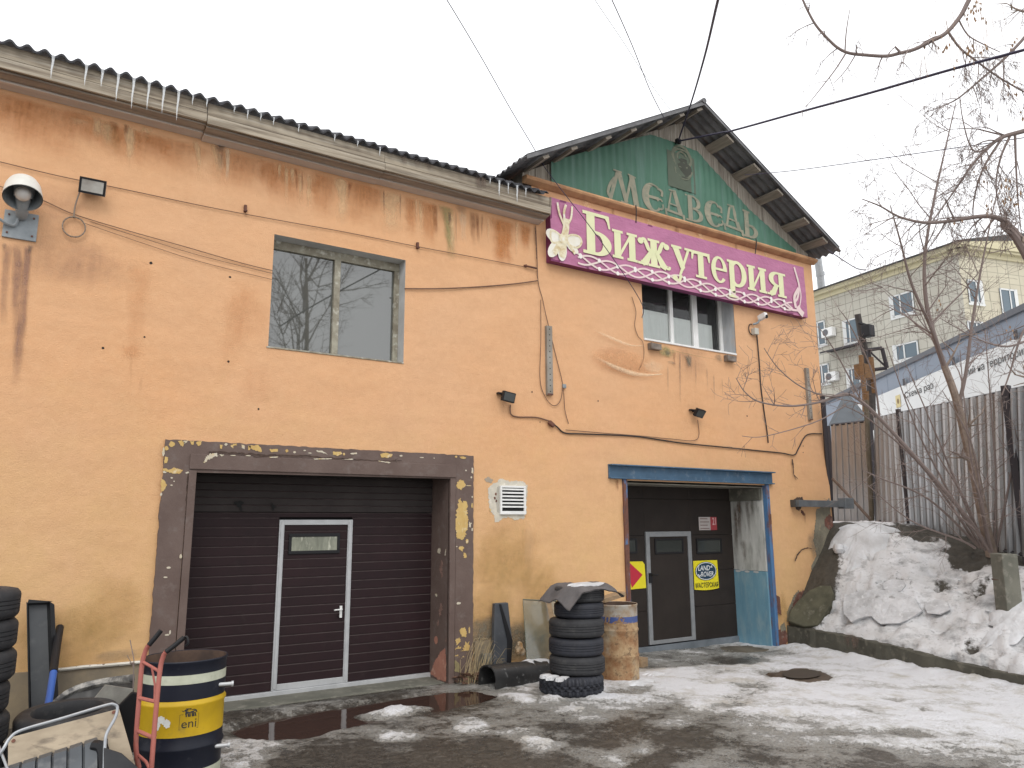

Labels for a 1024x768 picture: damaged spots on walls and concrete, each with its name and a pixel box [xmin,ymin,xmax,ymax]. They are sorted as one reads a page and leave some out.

leakage [14,246,31,353]
peeling [160,440,357,496]
peeling [437,456,473,578]
peeling [485,477,528,522]
spalling [430,594,470,681]